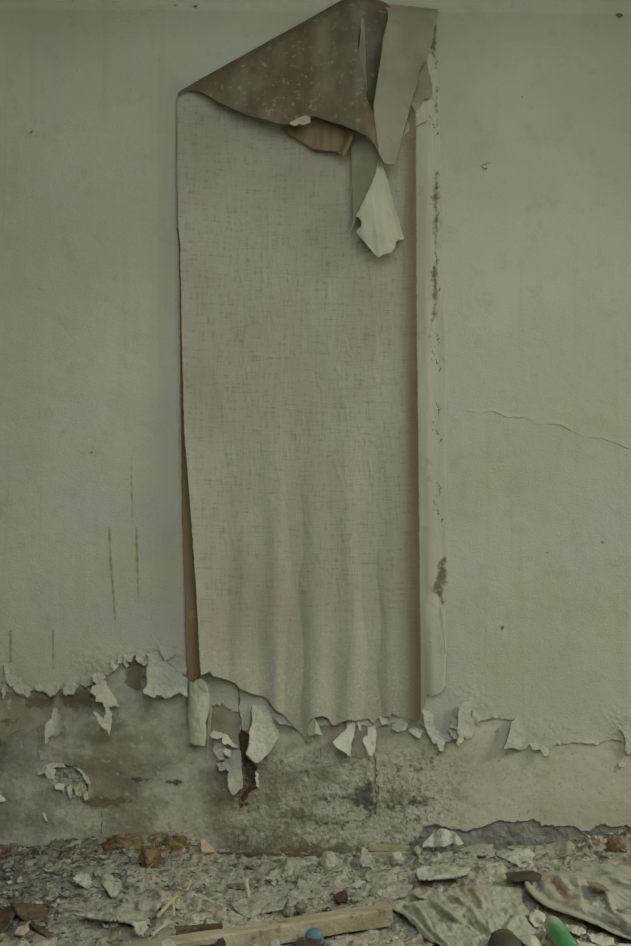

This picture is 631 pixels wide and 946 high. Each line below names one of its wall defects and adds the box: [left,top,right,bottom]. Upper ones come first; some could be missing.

flaking render [0,643,631,868]